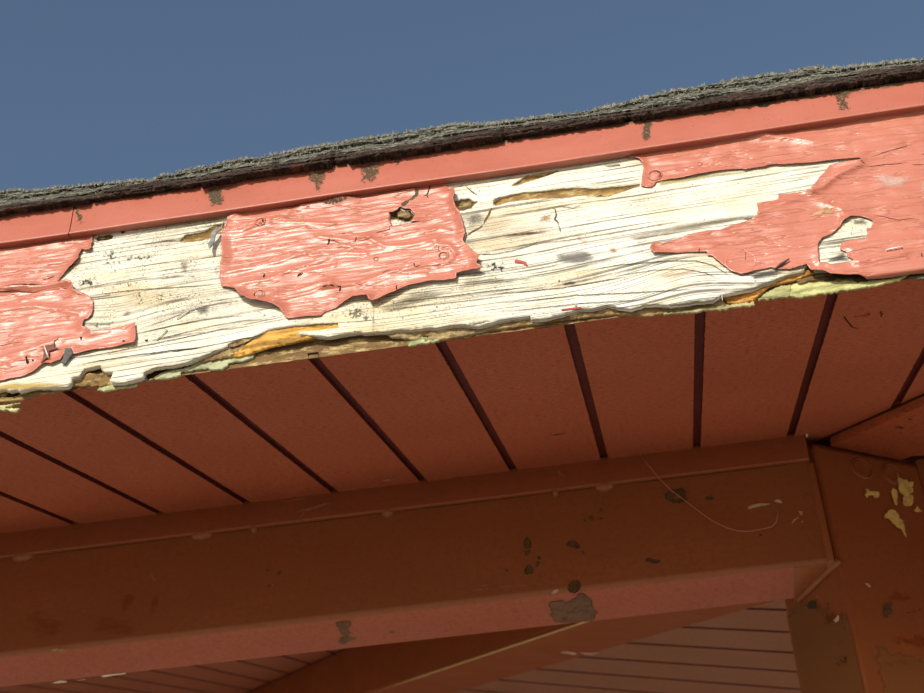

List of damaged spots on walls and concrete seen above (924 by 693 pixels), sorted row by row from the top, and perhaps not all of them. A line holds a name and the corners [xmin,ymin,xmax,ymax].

peeling [0,110,924,413]
peeling [884,473,923,537]
peeling [336,621,357,644]
peeling [548,580,598,623]